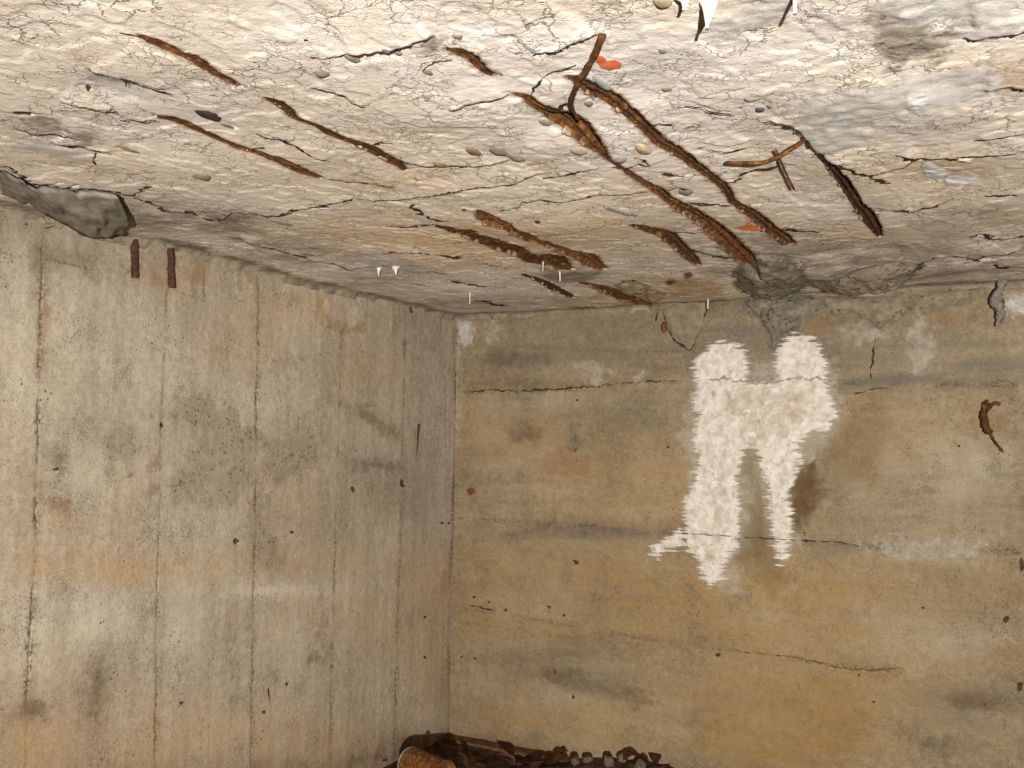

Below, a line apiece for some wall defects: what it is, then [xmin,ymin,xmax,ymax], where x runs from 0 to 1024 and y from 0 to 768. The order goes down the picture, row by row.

crack [86,68,171,95]
spalling [121,33,238,85]
spalling [120,115,323,179]
crack [0,129,684,271]
spalling [265,98,427,171]
crack [310,36,435,60]
crack [452,94,509,112]
spalling [514,65,797,269]
spalling [816,154,883,237]
crack [689,99,1024,184]
spalling [402,203,651,306]
water stain [648,332,844,589]